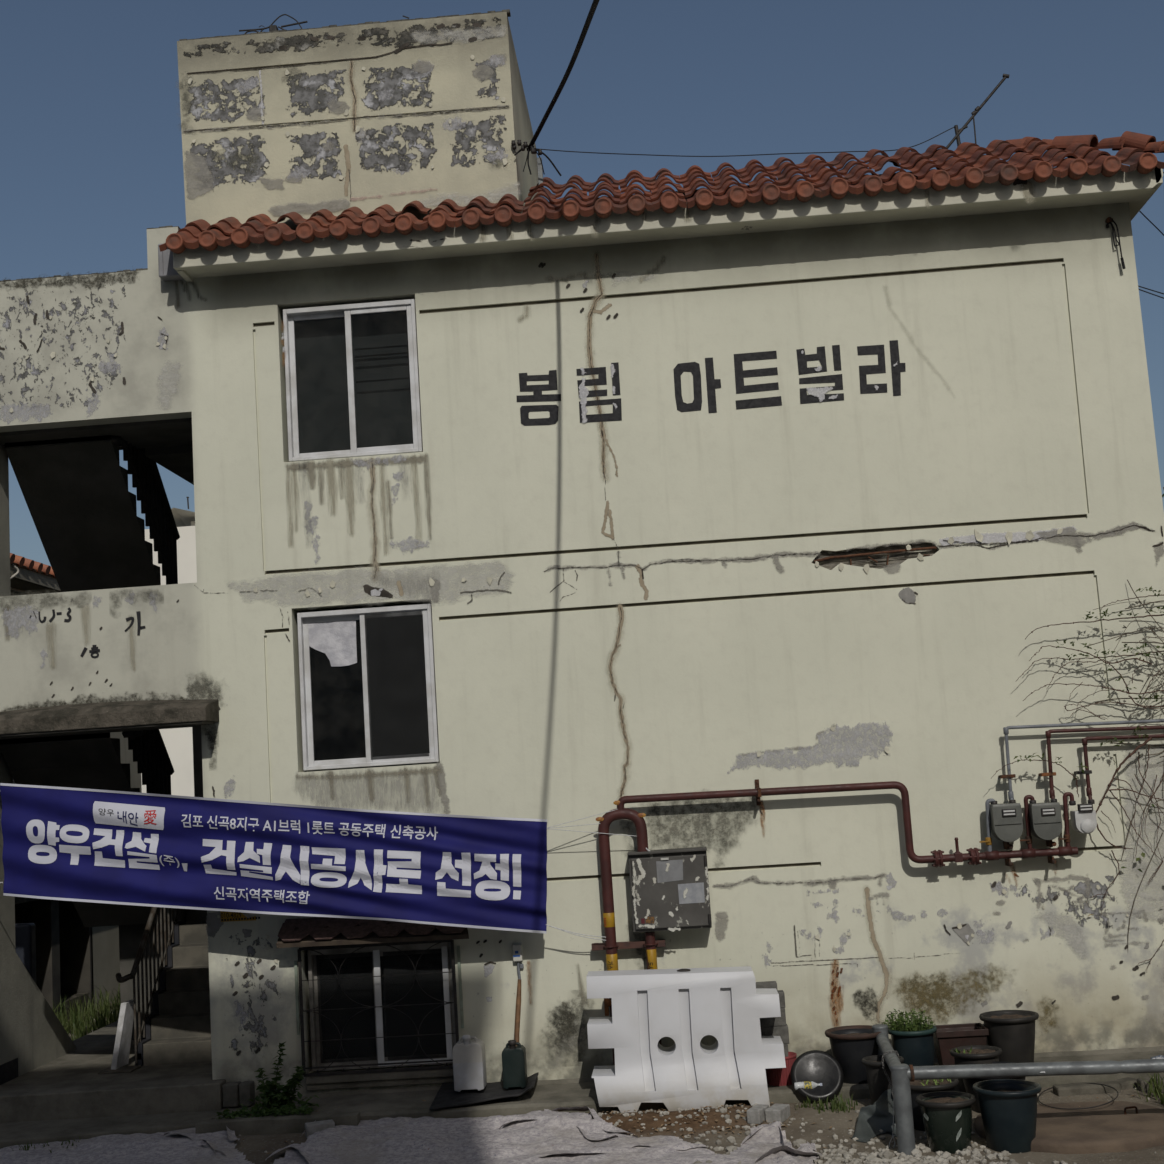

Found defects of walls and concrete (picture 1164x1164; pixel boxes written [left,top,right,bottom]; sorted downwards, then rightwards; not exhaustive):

peeling [180,76,344,199]
peeling [180,17,508,175]
peeling [0,271,137,424]
damp [287,455,431,563]
crack [544,253,819,798]
spalling [812,523,1139,574]
crack [938,523,1163,552]
damp [0,591,220,711]
damp [647,797,756,851]
peeling [206,911,281,1056]
damp [546,974,588,1057]
damp [715,912,728,940]